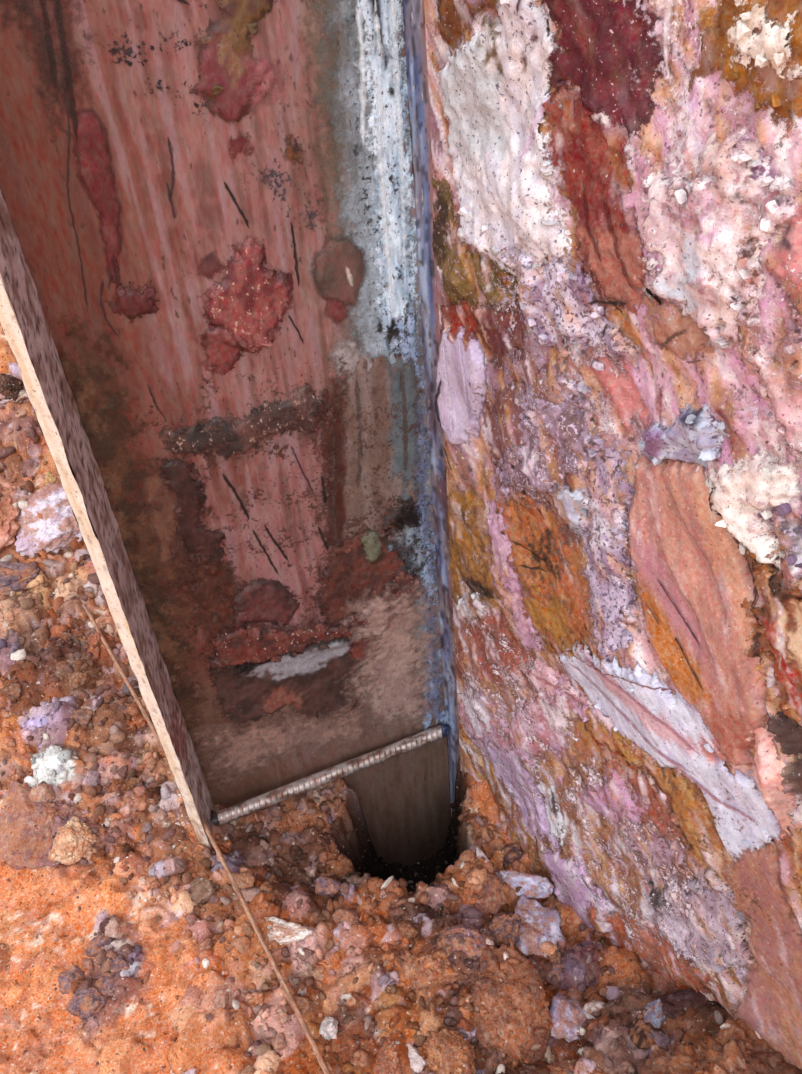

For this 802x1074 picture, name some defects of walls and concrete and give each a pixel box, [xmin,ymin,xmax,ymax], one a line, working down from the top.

peeling [189,0,282,122]
rust [73,109,160,323]
peeling [197,236,294,356]
damp [58,0,446,788]
damp [436,0,802,983]
spalling [232,578,300,630]
spalling [209,636,362,725]